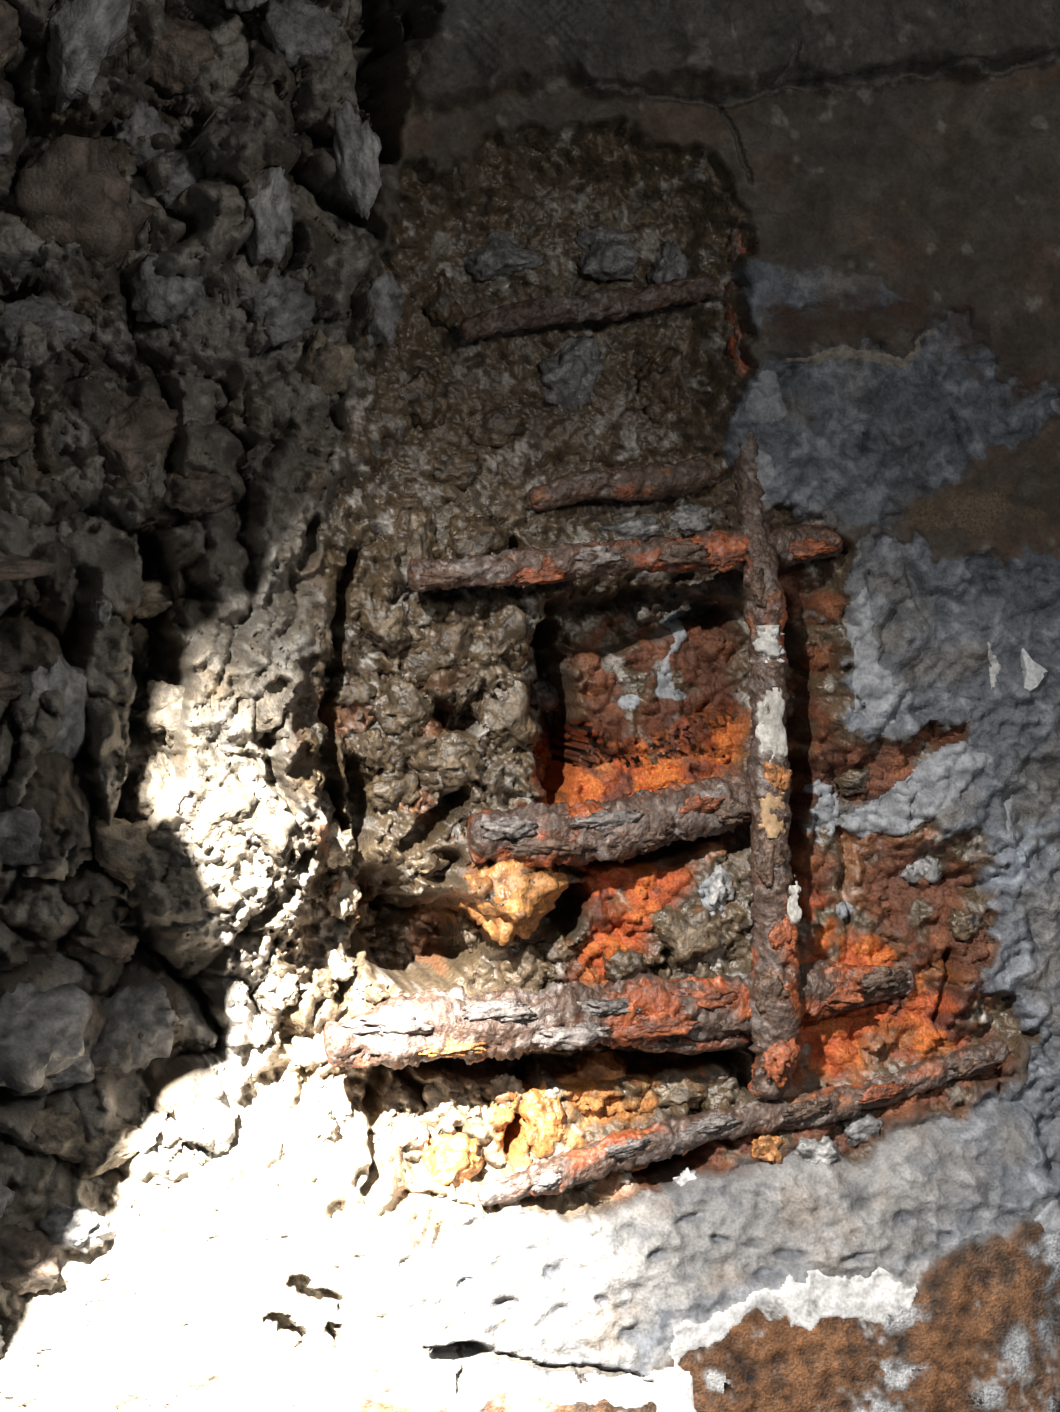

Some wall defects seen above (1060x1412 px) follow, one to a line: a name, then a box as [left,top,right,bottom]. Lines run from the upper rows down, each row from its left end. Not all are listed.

rust [532,614,747,807]
spalling [241,123,1060,1412]
rust [500,914,529,927]
rust [571,859,693,985]
rust [785,694,994,1079]
rust [493,1068,538,1166]
rust [553,1032,750,1149]
rust [661,1133,761,1171]
rust [792,1122,853,1150]
rust [861,1053,1013,1119]
rust [665,1220,1060,1412]
rust [359,1386,657,1412]